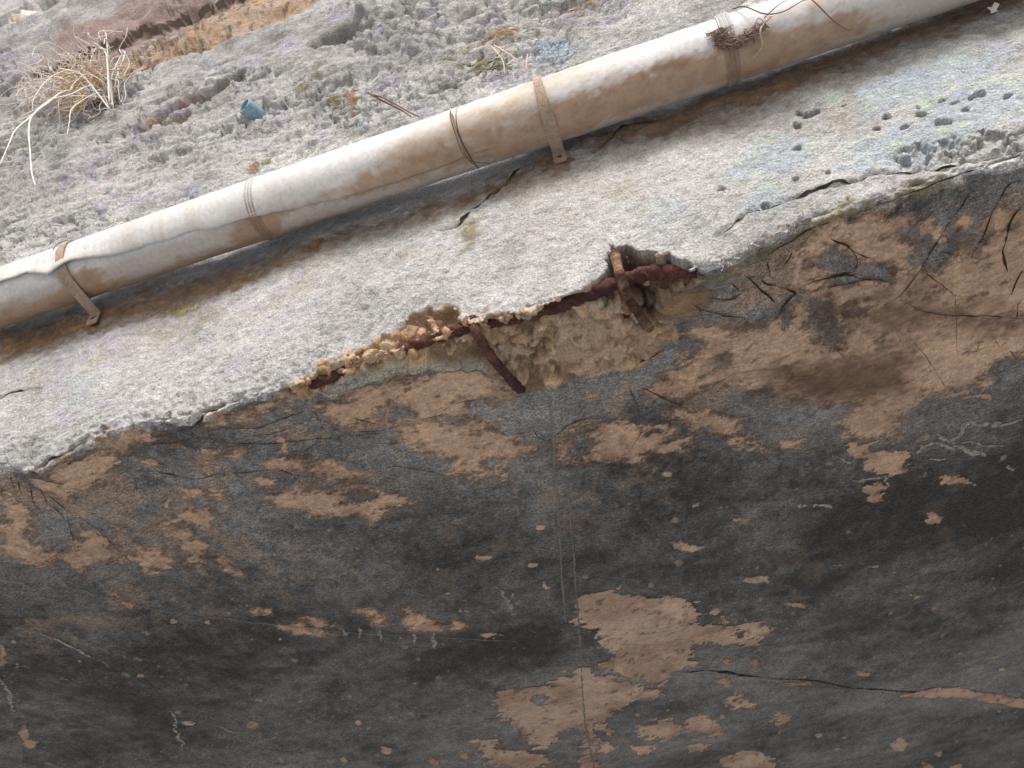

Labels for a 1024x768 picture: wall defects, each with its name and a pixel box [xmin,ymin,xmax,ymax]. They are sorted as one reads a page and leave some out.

crack [456,157,535,228]
crack [693,150,1023,361]
peeling [0,196,1024,581]
leakage [776,351,915,400]
efflorescence [917,419,1022,461]
crack [10,476,127,558]